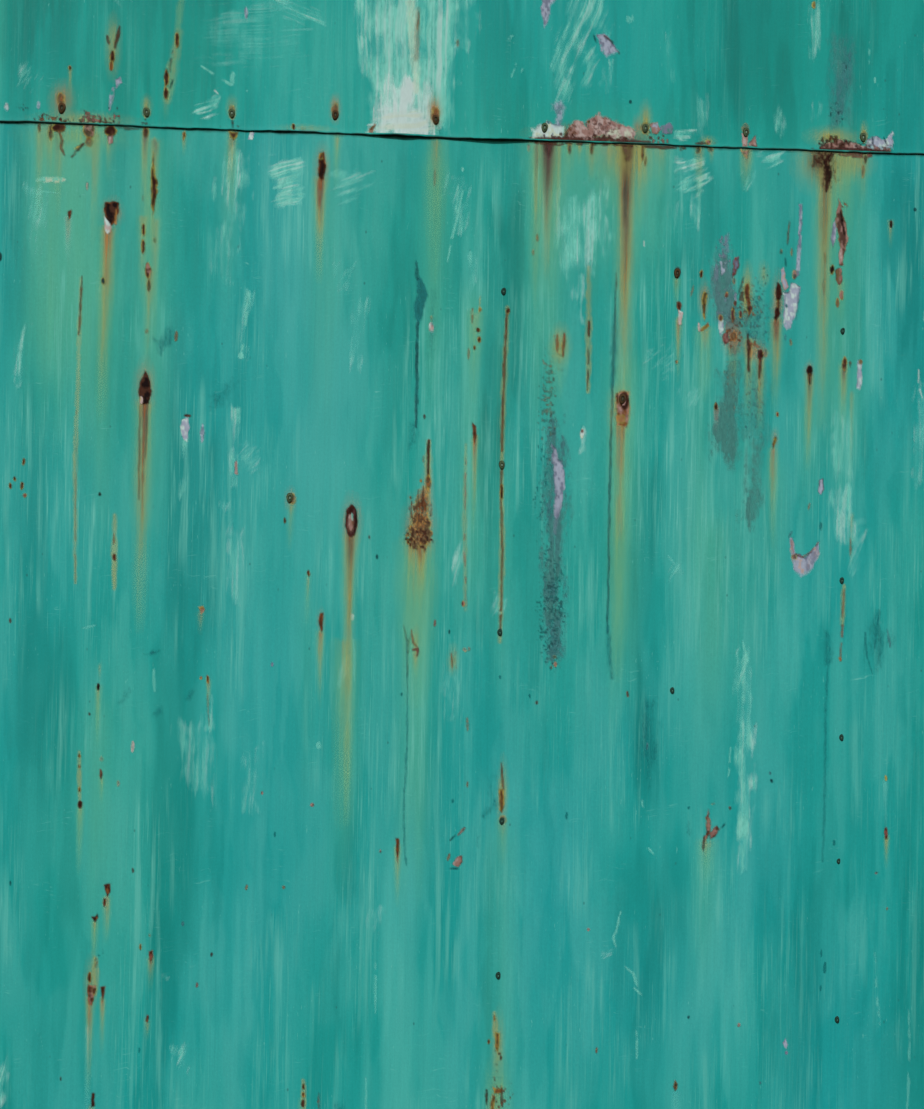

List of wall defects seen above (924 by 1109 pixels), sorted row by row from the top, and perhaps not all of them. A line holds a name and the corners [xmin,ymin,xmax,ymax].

rust [34,26,122,157]
peeling [532,104,651,143]
rust [101,201,119,284]
rust [535,117,712,311]
peeling [719,257,742,344]
peeling [781,204,802,343]
peeling [830,201,848,307]
rust [811,151,872,256]
rust [138,371,152,511]
rust [345,505,358,613]
rust [405,440,433,574]
peeling [790,538,819,576]